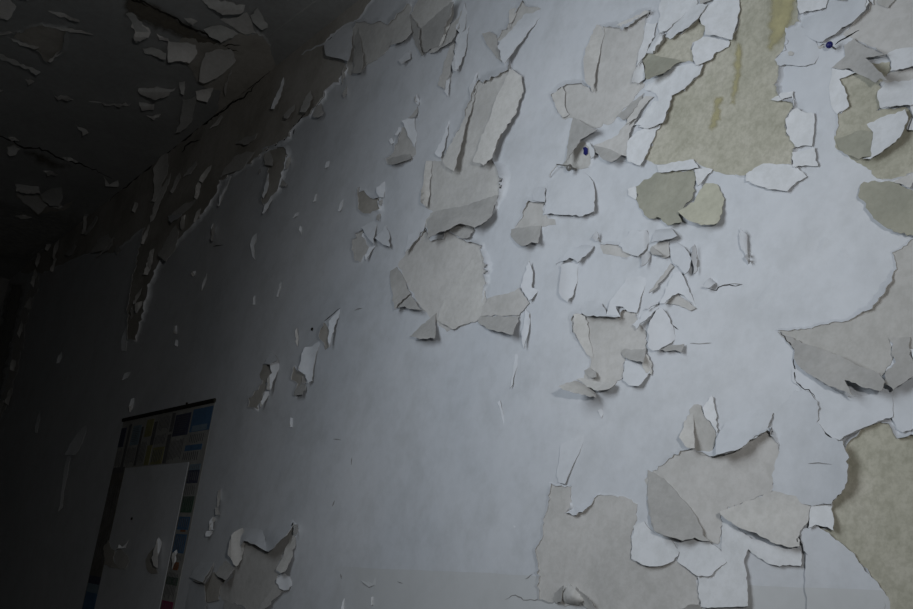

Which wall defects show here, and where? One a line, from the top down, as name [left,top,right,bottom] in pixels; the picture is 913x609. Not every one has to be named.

crack [131,0,241,51]
crack [168,74,267,153]
peeling [15,0,470,343]
peeling [390,0,541,349]
peeling [510,0,913,609]
peeling [246,352,279,411]
peeling [289,309,340,398]
peeling [185,519,298,609]